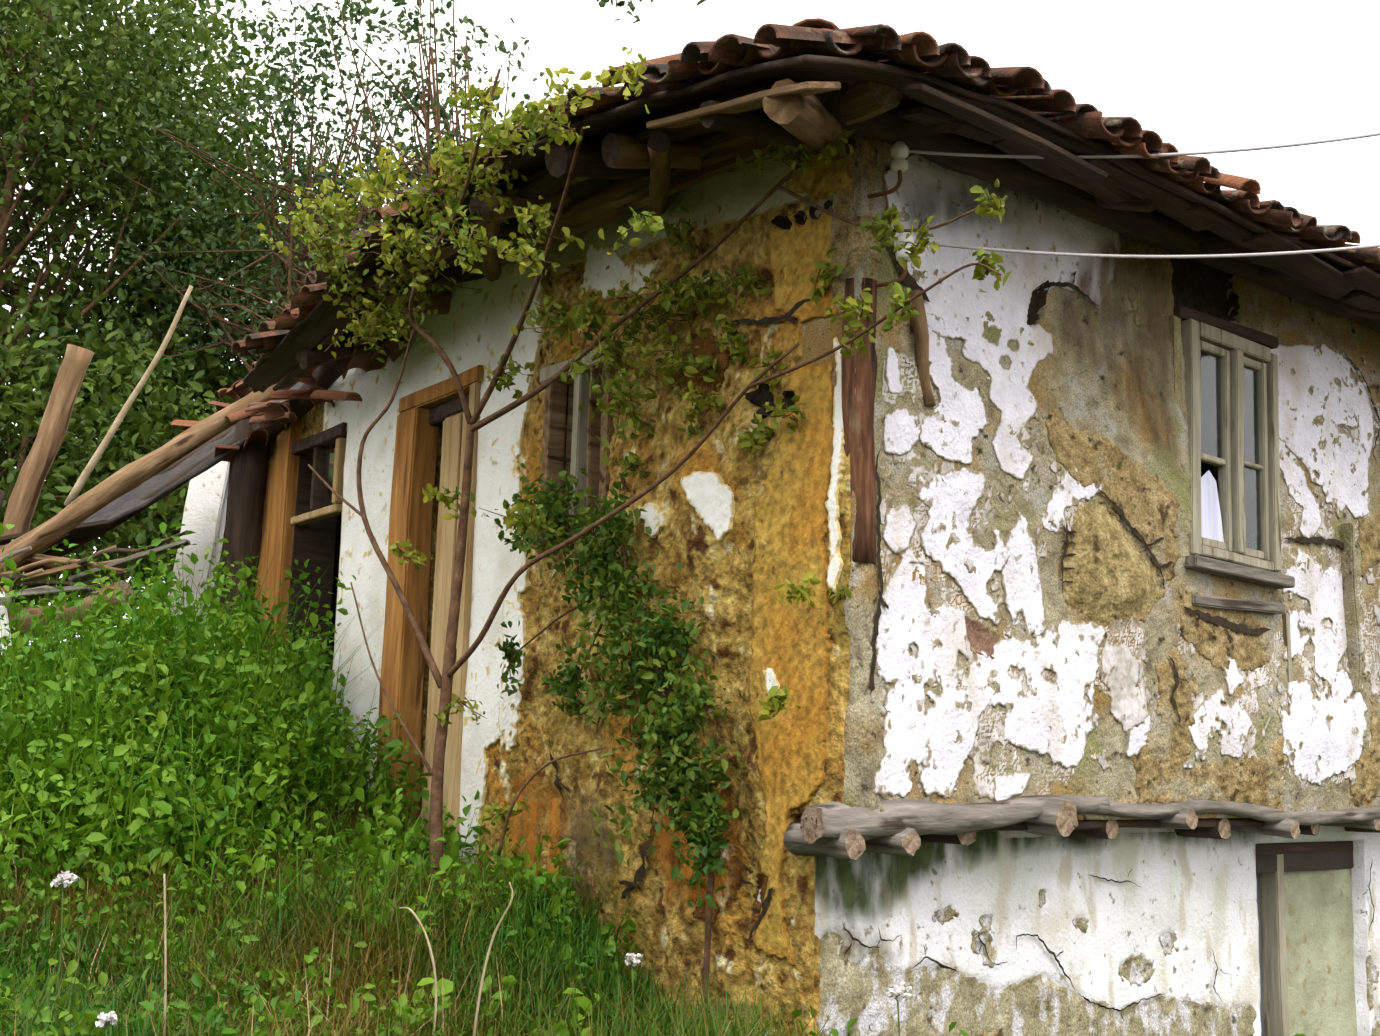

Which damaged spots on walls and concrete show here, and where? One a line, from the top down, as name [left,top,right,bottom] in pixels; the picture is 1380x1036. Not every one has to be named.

flaking render [323,145,853,864]
flaking render [874,153,1380,809]
crack [1098,488,1272,641]
flaking render [744,337,845,966]
spalling [690,879,720,923]
spalling [932,905,959,925]
crack [843,925,1163,1021]
spalling [813,913,1257,1036]
spalling [1038,889,1046,908]